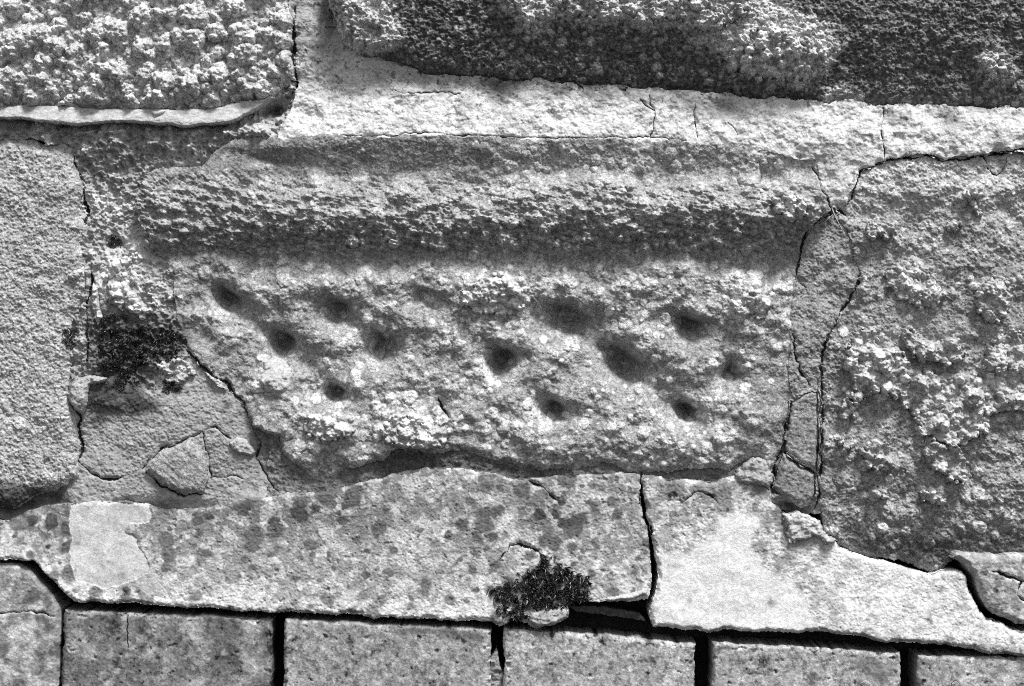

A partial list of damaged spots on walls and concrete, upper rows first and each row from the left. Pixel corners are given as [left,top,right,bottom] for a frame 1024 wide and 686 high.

crack [795,105,1024,287]
crack [70,350,279,497]
crack [771,275,861,509]
crack [639,472,653,568]